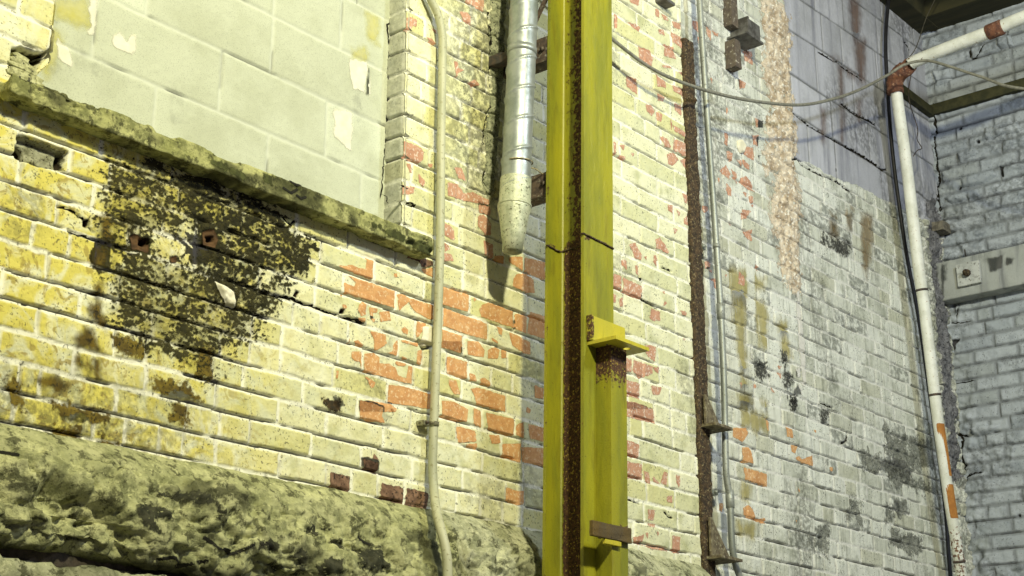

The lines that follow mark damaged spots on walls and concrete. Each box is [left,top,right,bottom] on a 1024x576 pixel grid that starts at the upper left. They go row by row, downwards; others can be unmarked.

spalling [10,50,45,66]
peeling [112,33,137,54]
peeling [333,109,353,150]
peeling [349,59,370,94]
crack [482,12,492,195]
crack [792,113,886,192]
crack [933,103,942,212]
damp [75,147,322,431]
damp [729,269,790,433]
damp [4,375,28,413]
damp [38,377,120,446]
crack [957,420,982,487]